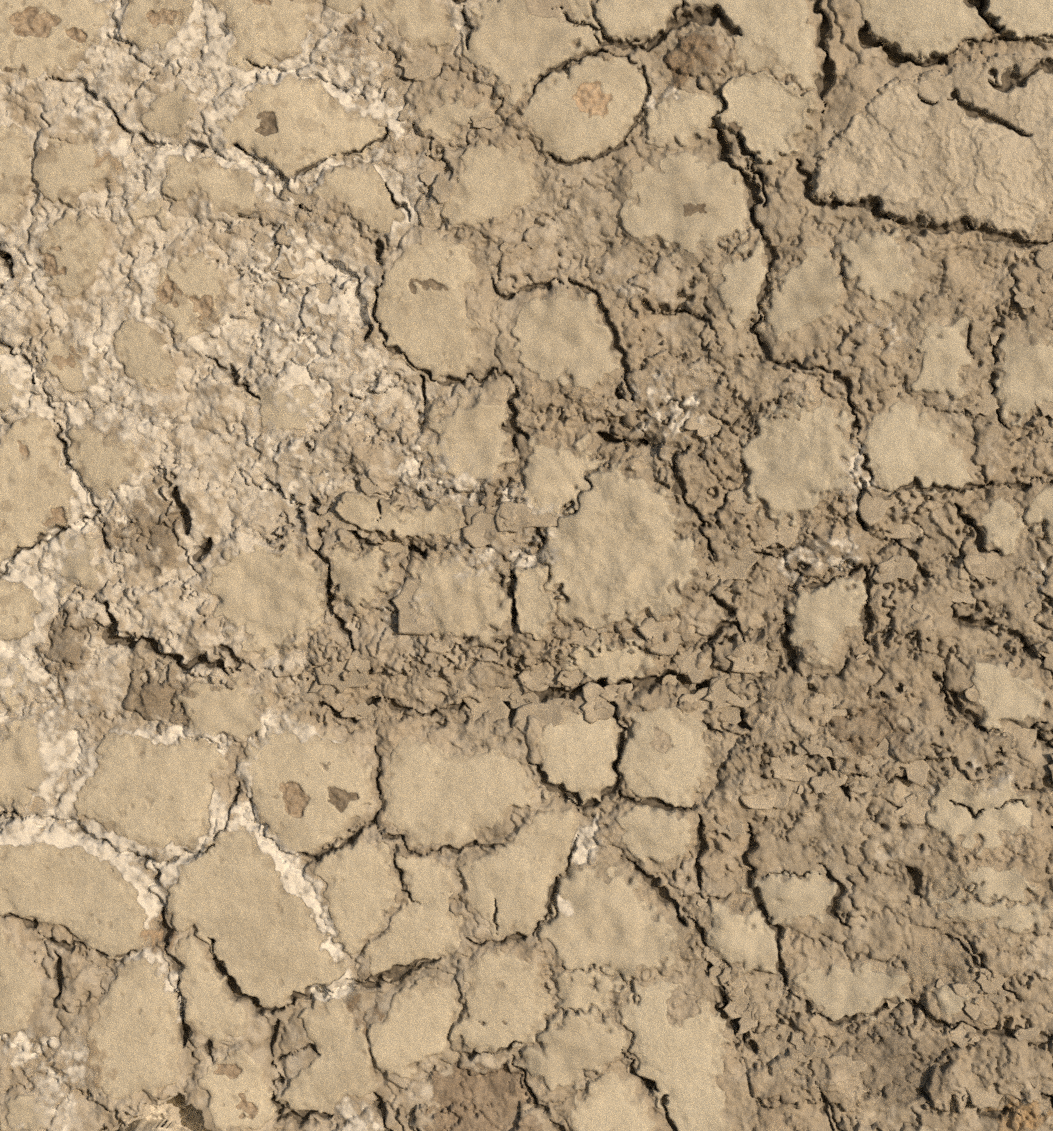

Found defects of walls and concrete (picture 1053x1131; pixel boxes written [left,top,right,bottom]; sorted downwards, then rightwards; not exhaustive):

crack [858,0,1053,137]
water stain [52,0,436,421]
efflorescence [0,223,171,449]
crack [331,240,529,447]
crack [708,127,1053,553]
water stain [243,423,339,514]
water stain [386,440,491,513]
crack [92,598,241,674]
water stain [0,445,372,1056]
spalling [0,230,1053,1131]
crack [529,671,757,1053]
crack [742,822,1016,1038]